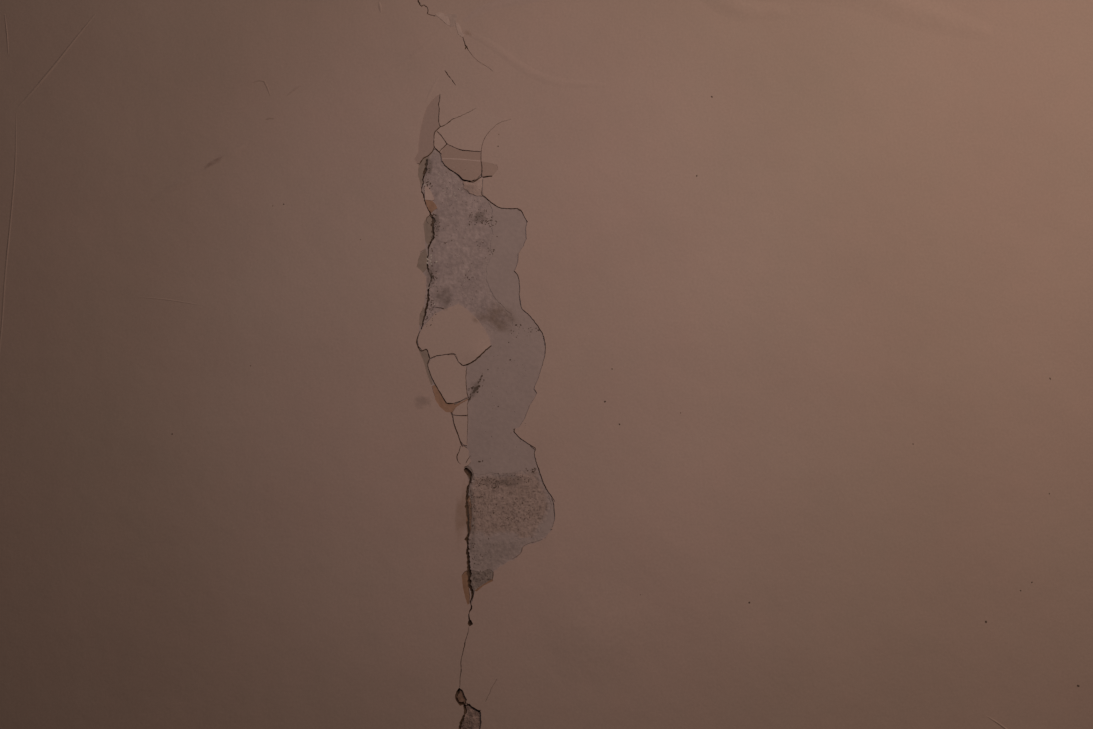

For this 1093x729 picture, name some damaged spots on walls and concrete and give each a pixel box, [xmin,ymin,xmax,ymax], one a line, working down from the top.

crack [417,72,501,329]
peeling [414,76,555,604]
crack [451,413,474,677]
spalling [455,688,482,729]